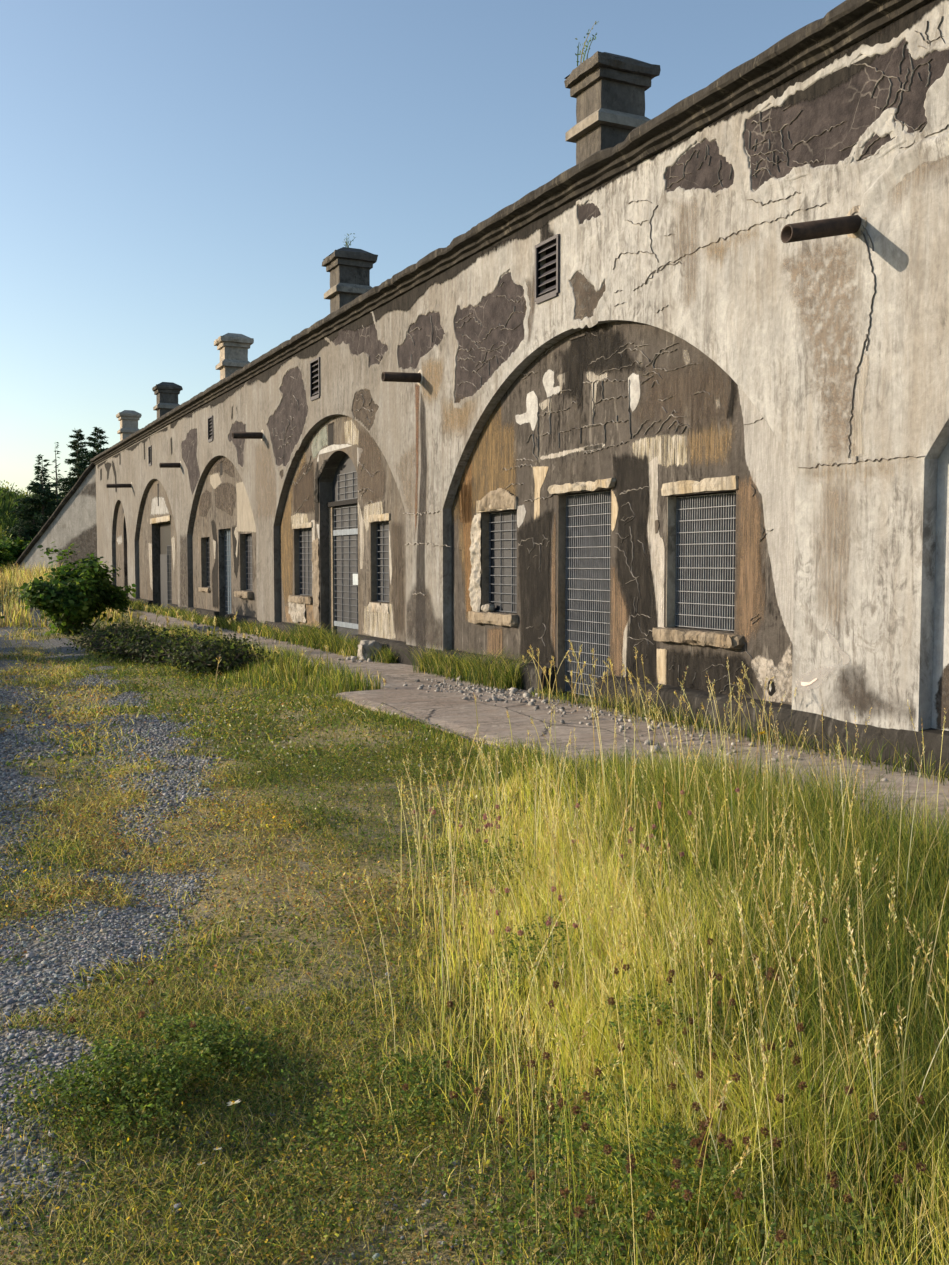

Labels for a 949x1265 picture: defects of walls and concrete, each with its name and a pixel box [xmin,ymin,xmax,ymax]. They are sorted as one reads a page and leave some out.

crack [613,16,949,313]
spalling [659,28,949,205]
spalling [181,416,247,517]
spalling [266,361,310,485]
spalling [324,261,532,437]
crack [518,535,549,571]
crack [376,282,710,502]
spalling [566,261,611,329]
crack [798,224,922,469]